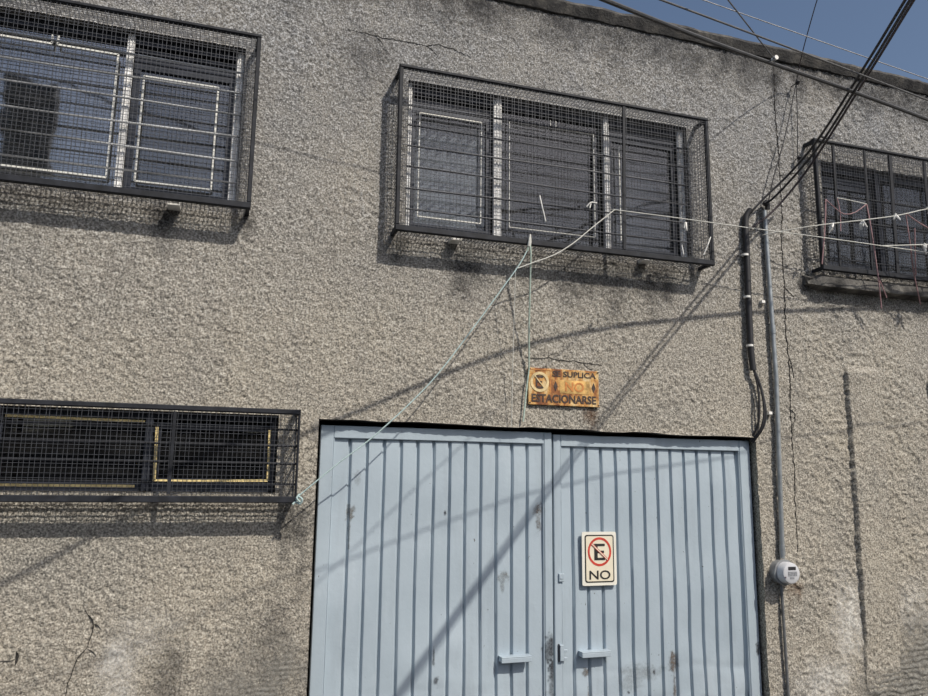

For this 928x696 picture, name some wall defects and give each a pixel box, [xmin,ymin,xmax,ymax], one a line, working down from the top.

crack [348,29,471,58]
crack [773,68,798,552]
crack [65,609,101,696]